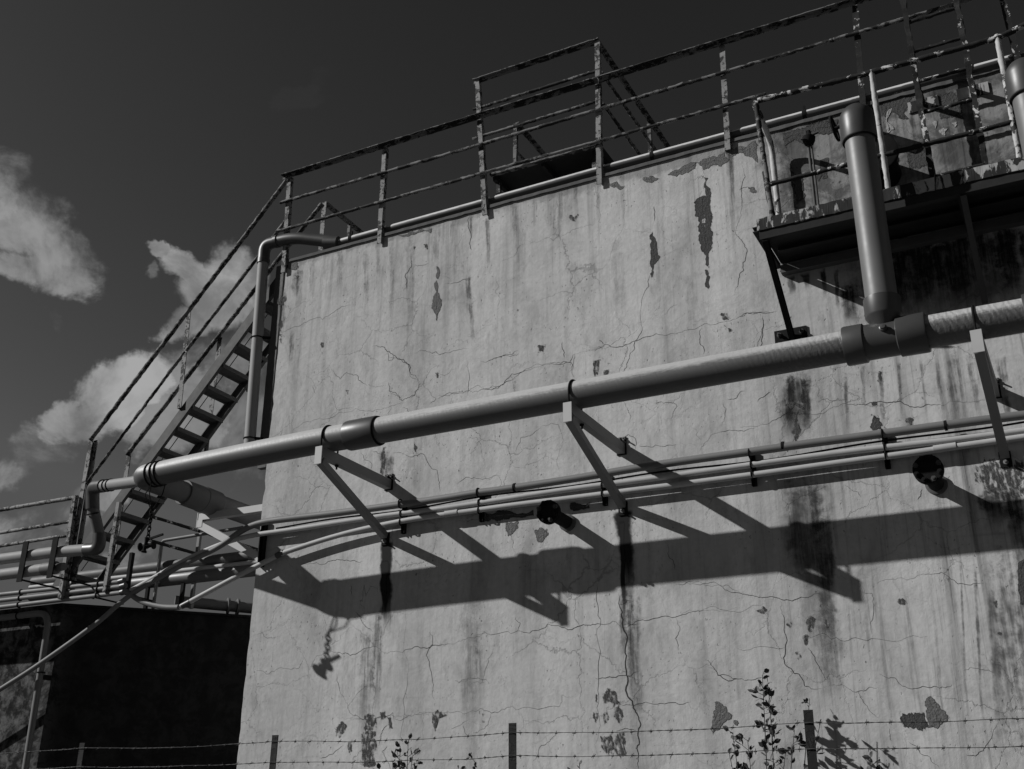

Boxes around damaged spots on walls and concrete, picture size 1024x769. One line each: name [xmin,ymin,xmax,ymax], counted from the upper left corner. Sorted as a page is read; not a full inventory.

peeling [643,141,758,288]
peeling [432,266,442,321]
crack [298,311,776,427]
crack [331,547,991,767]
spalling [335,712,392,767]
spalling [593,688,626,758]
peeling [712,701,738,732]
peeling [900,696,949,731]